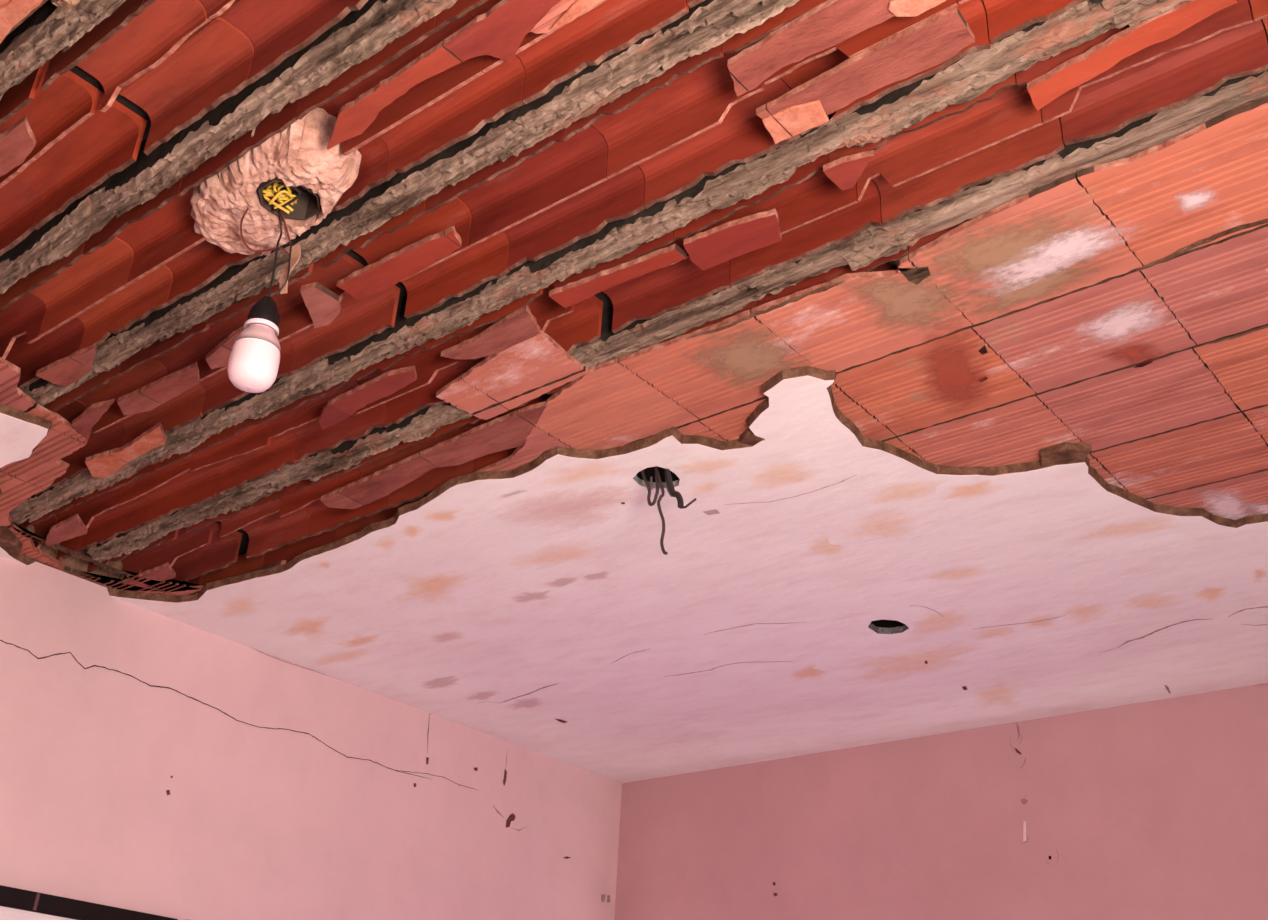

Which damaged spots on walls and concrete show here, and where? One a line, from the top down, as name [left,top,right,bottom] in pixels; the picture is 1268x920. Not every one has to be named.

peeling [0,0,40,41]
peeling [549,0,602,30]
peeling [888,0,946,17]
peeling [763,100,829,144]
flaking render [0,404,52,434]
flaking render [107,366,1268,603]
flaking render [0,526,35,565]